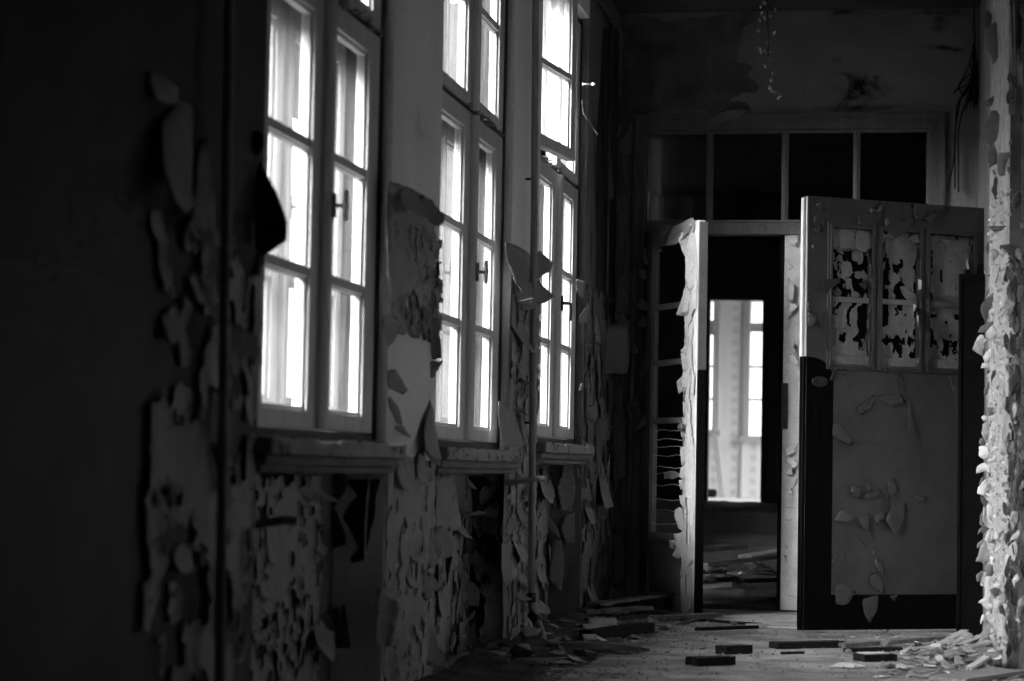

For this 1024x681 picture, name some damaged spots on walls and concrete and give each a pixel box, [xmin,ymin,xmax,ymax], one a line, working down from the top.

peeling [984,9,998,64]
peeling [787,202,971,432]
peeling [142,27,629,681]
peeling [973,71,1024,662]
peeling [643,218,697,612]
peeling [786,443,799,493]
peeling [832,420,854,445]
peeling [835,478,927,534]
peeling [835,550,898,623]